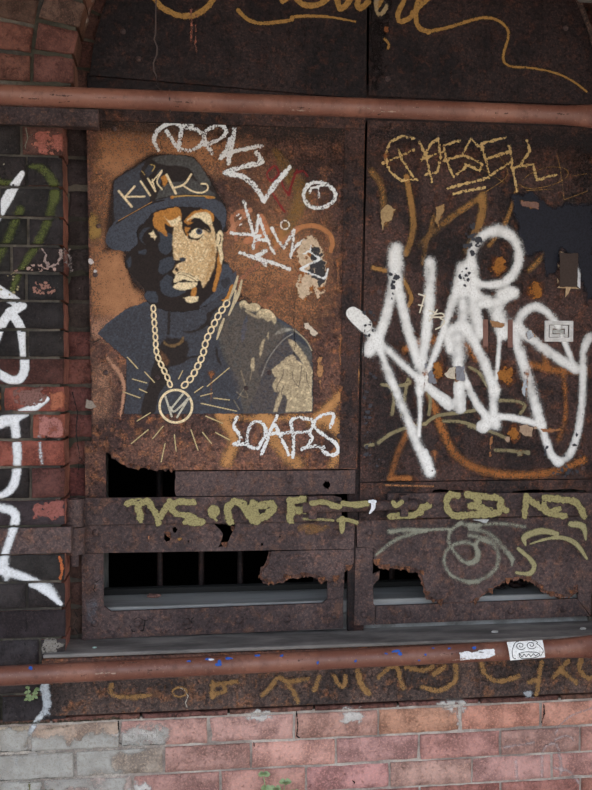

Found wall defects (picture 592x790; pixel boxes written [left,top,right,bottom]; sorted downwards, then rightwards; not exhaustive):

rust [89,127,341,344]
rust [403,174,487,265]
rust [488,257,507,276]
rust [526,254,544,299]
rust [401,334,438,354]
rust [92,356,126,420]
rust [215,387,342,469]
rust [385,422,434,487]
rust [422,353,588,479]